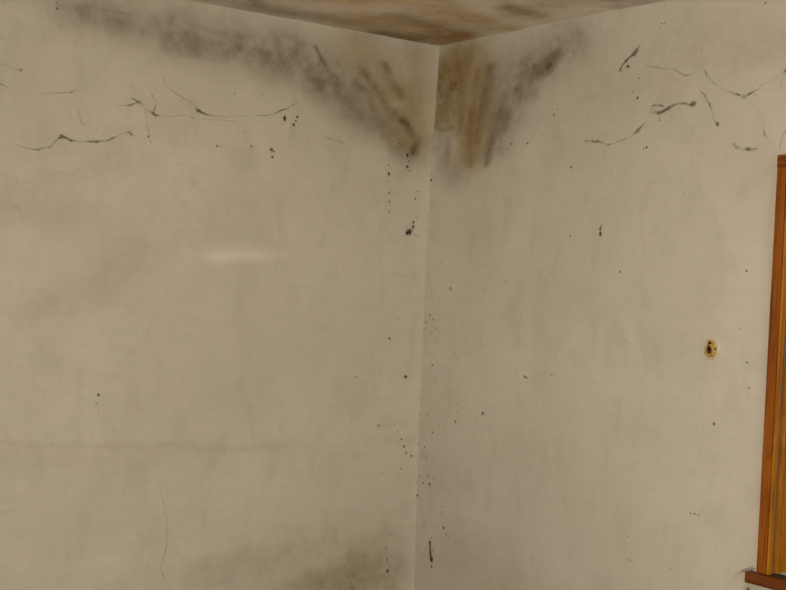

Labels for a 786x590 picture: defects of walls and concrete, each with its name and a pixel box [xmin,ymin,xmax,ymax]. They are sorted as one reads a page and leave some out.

leakage [0,0,666,197]
leakage [150,503,416,590]
leakage [736,566,772,590]